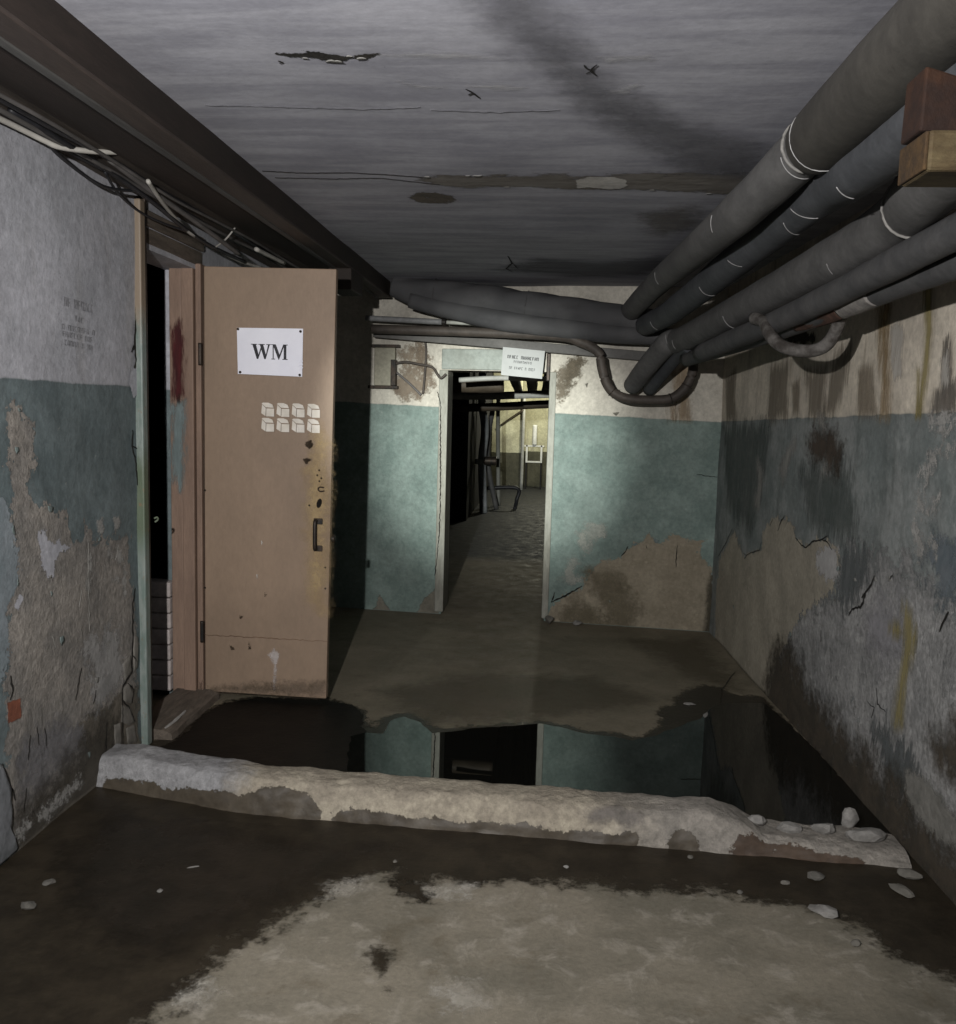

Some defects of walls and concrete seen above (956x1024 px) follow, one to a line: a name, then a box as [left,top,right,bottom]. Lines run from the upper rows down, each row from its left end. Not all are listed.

spalling [275,50,379,64]
spalling [415,172,746,195]
water stain [499,259,663,276]
water stain [725,344,876,530]
water stain [911,333,956,565]
peeling [0,396,141,858]
crack [105,588,138,752]
spalling [548,514,956,866]
crack [719,517,832,559]
water stain [800,462,870,617]
crack [849,575,893,615]